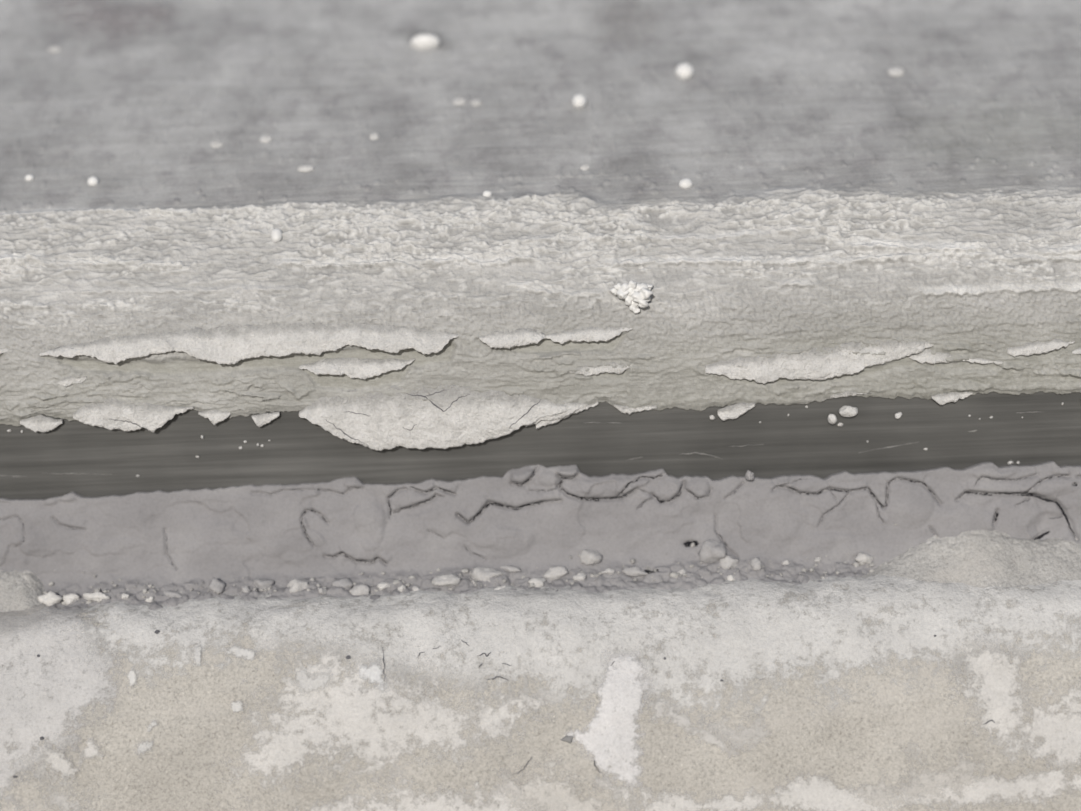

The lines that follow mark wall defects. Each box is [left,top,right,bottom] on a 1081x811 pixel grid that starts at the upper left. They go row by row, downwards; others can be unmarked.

peeling [479,326,632,349]
peeling [20,323,598,451]
peeling [569,362,632,377]
peeling [614,404,657,415]
peeling [717,403,755,421]
peeling [705,339,1081,384]
peeling [931,391,973,405]
crack [265,488,387,564]
crack [388,470,743,557]
crack [774,474,1081,540]
peeling [561,650,652,787]